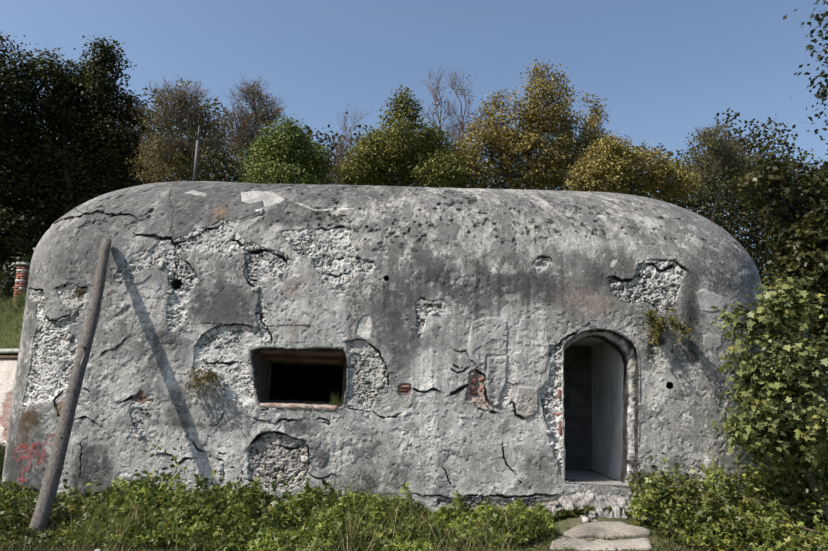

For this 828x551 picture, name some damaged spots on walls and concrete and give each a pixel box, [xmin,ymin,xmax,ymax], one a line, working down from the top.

crack [53,185,287,275]
spalling [115,191,376,405]
spalling [608,260,686,311]
spalling [24,283,89,414]
spalling [346,315,412,418]
spalling [248,432,310,490]
crack [414,443,558,502]